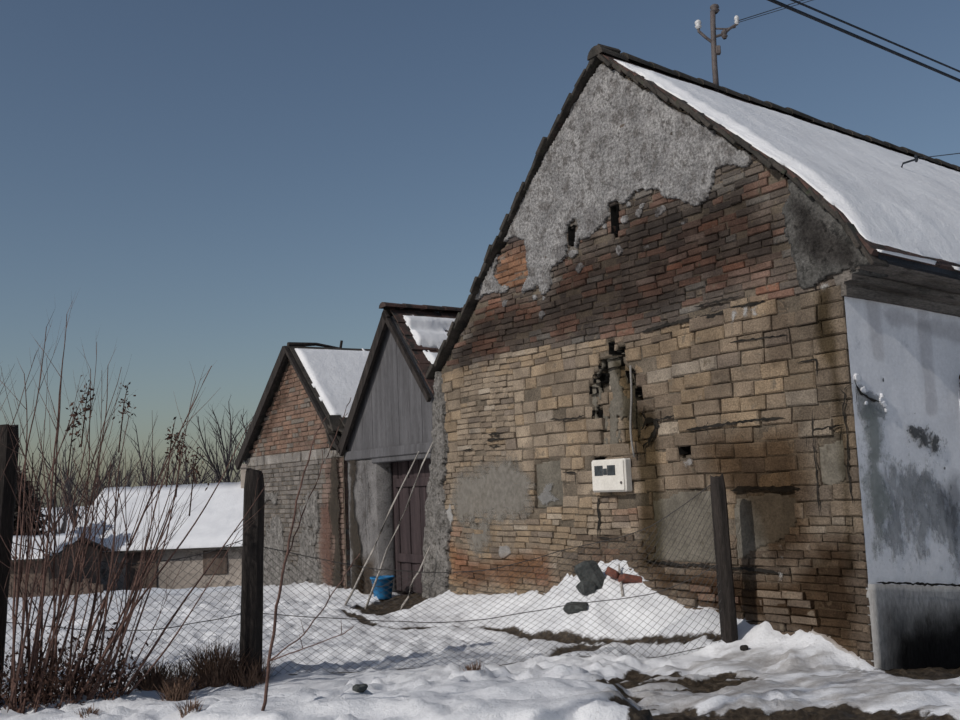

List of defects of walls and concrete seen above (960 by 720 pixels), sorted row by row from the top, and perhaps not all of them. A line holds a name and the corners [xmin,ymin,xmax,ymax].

peeling [475,64,753,320]
spalling [589,342,643,397]
water stain [907,425,947,456]
water stain [873,454,960,562]